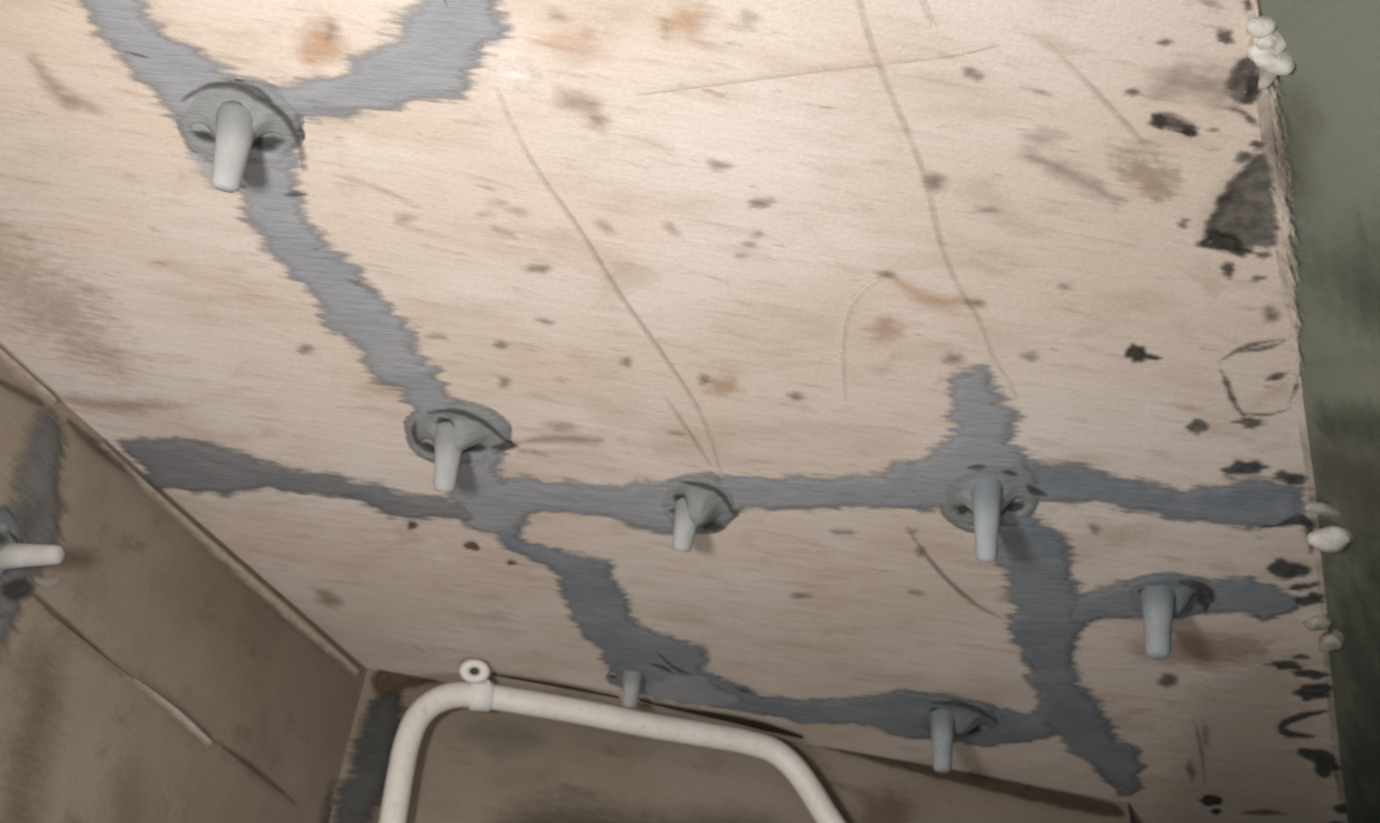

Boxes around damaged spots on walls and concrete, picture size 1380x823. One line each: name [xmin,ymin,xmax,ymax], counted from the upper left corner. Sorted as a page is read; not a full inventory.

crack [81,0,235,142]
crack [238,0,510,423]
crack [220,690,405,823]
crack [0,365,1307,796]